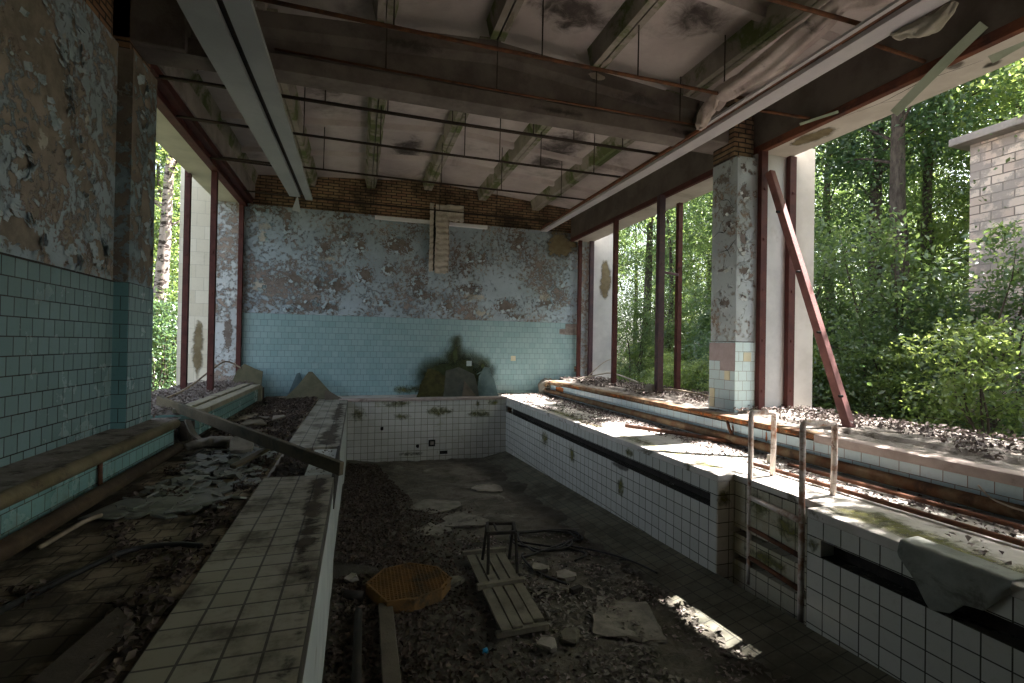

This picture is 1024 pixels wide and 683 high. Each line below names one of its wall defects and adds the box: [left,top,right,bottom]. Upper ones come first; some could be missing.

leakage [544,0,600,29]
leakage [679,2,718,30]
peeling [10,128,48,181]
peeling [0,200,49,261]
peeling [141,150,155,271]
peeling [716,163,750,275]
peeling [282,213,526,321]
leakage [600,261,611,298]
leakage [192,321,203,374]
peeling [222,314,233,353]